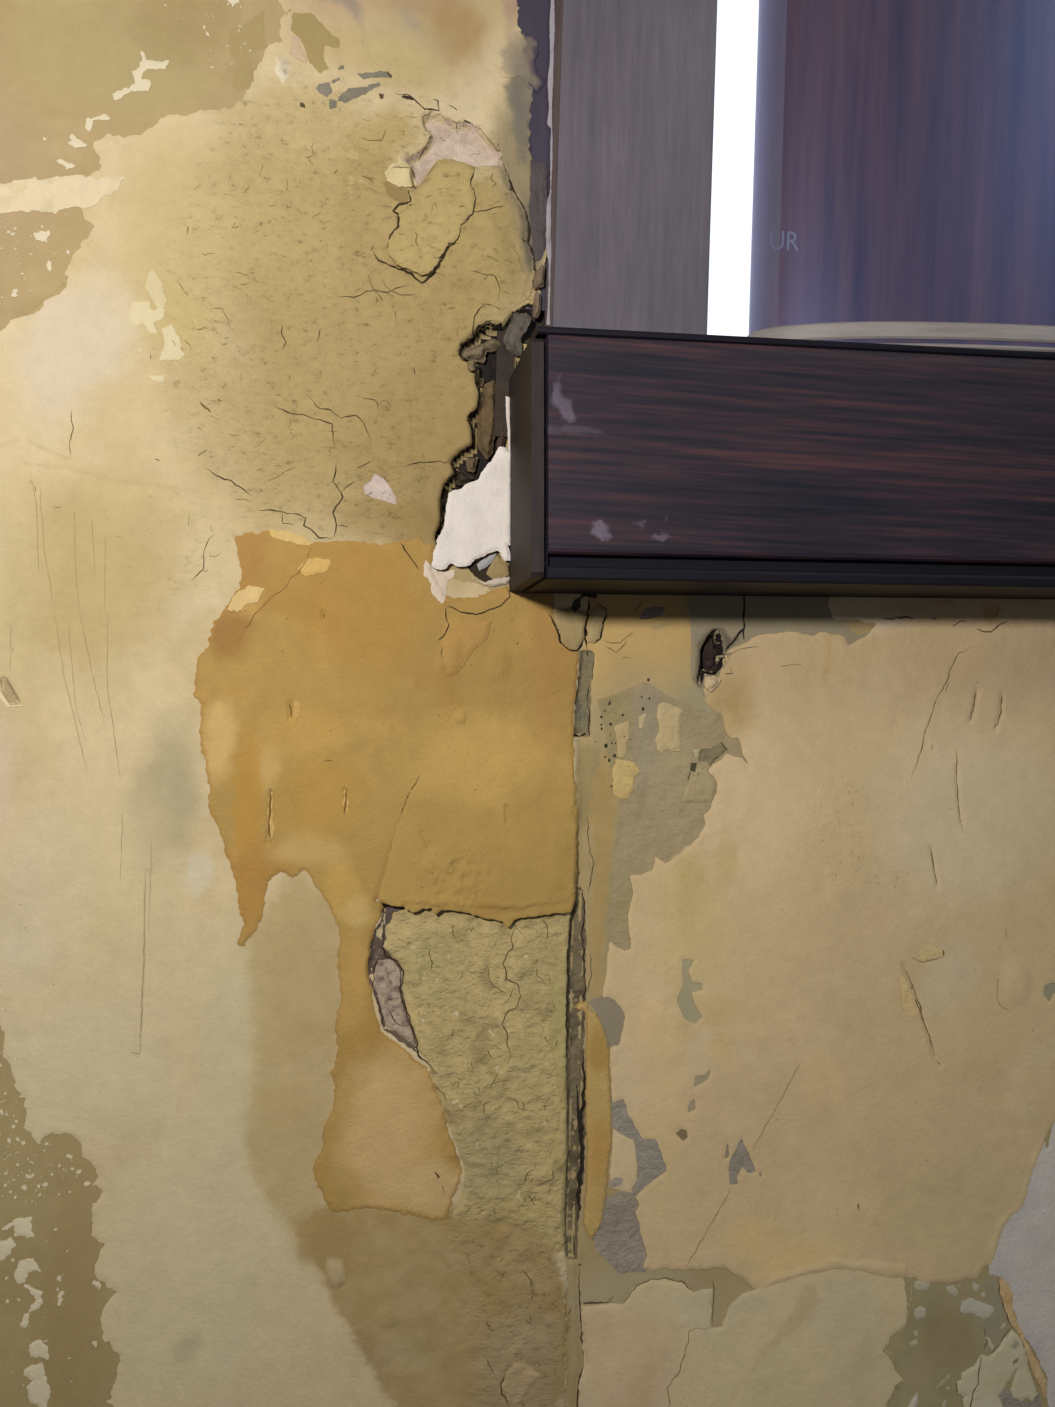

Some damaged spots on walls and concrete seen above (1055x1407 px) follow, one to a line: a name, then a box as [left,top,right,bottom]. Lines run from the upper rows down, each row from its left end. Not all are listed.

peeling [0,0,392,184]
peeling [0,207,94,331]
crack [173,143,447,635]
crack [339,164,536,380]
peeling [193,303,667,1273]
peeling [598,595,870,950]
peeling [0,975,120,1407]
crack [372,924,456,1102]
crack [467,817,729,1407]
peeling [726,1139,762,1184]
crack [753,1068,798,1149]
peeling [883,1122,1055,1407]